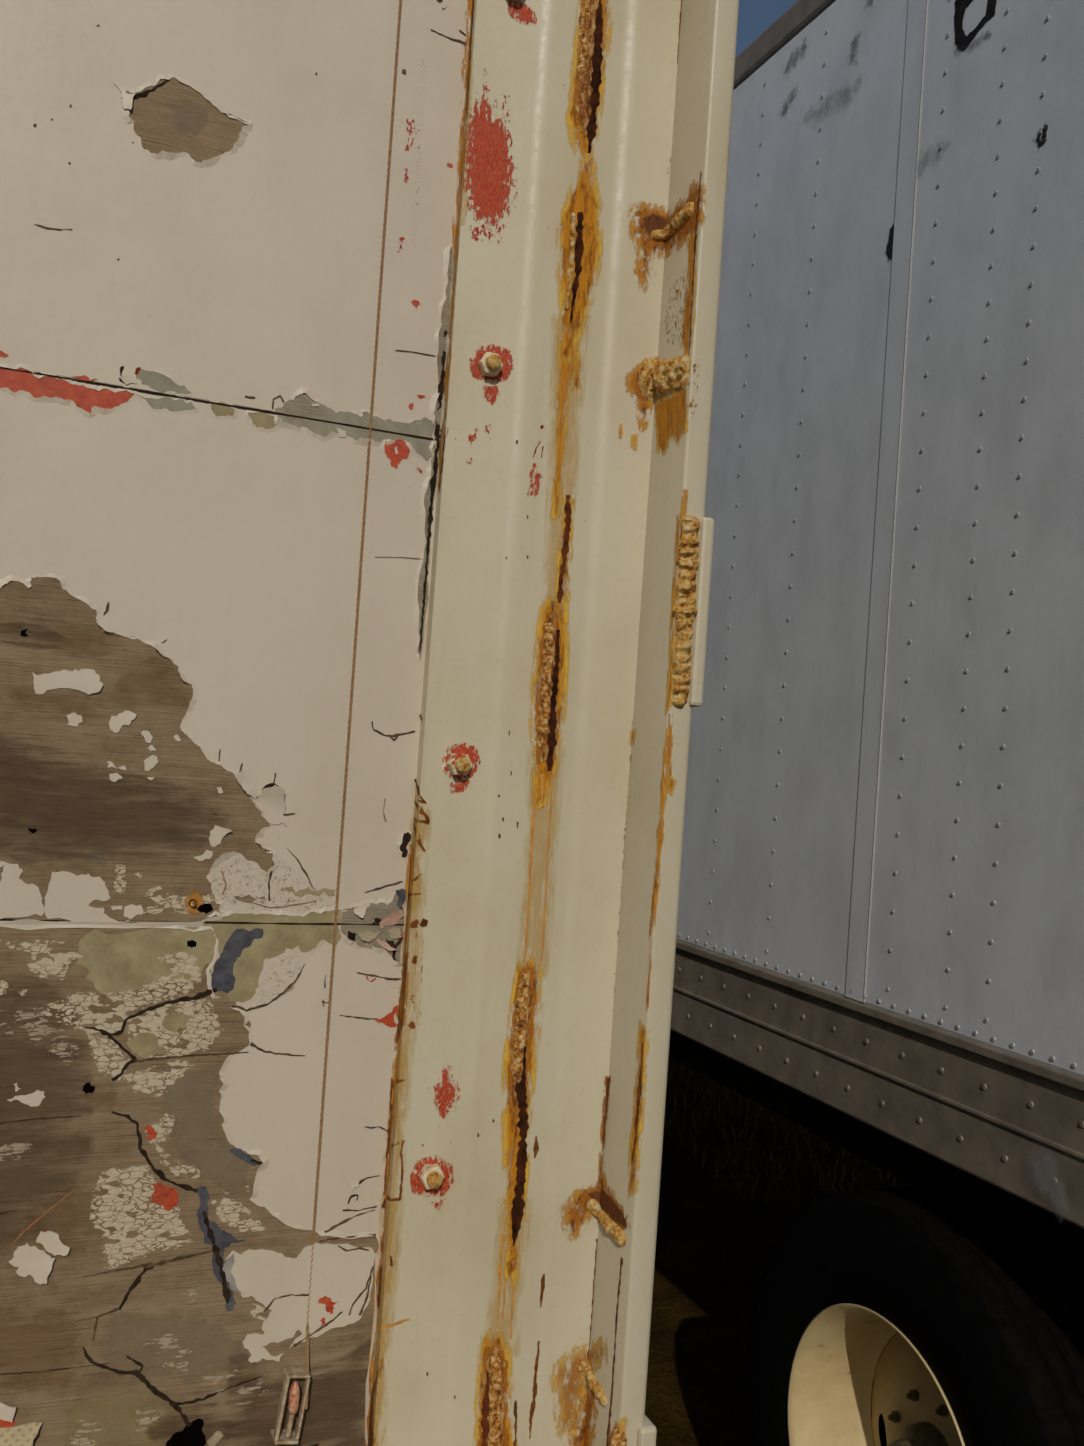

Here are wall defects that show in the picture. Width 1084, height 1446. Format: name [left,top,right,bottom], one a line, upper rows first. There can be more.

peeling [115,74,253,168]
peeling [0,243,454,662]
peeling [404,118,420,205]
corrosion [437,0,474,493]
peeling [447,68,518,243]
corrosion [619,172,706,454]
corrosion [474,0,627,1446]
crack [75,987,305,1427]
peeling [0,573,406,1446]
crack [340,972,401,1027]
corrosion [364,778,430,1446]
corrosion [562,956,651,1239]